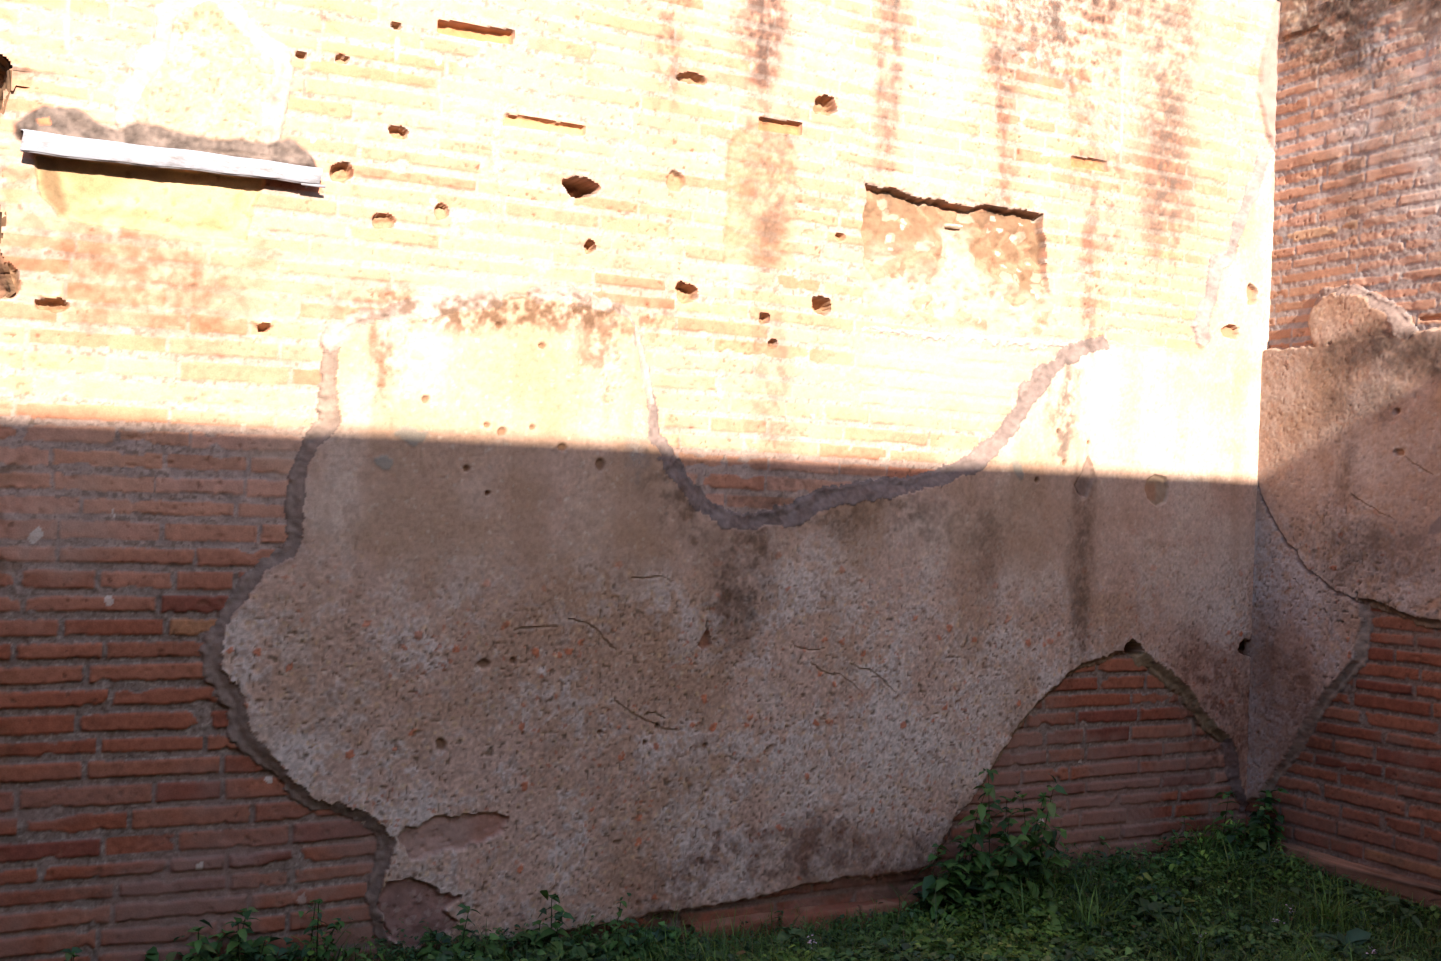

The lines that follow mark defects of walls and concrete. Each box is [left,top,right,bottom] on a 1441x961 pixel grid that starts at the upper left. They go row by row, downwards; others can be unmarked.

spalling [437,19,515,45]
water stain [747,0,783,86]
water stain [973,0,1113,106]
water stain [1291,0,1362,65]
spalling [503,112,586,136]
spalling [35,154,266,243]
spalling [722,117,802,270]
spalling [860,183,1058,340]
water stain [1354,329,1441,375]
spalling [1145,473,1169,506]
spalling [930,608,1441,887]
flaking render [376,810,510,949]